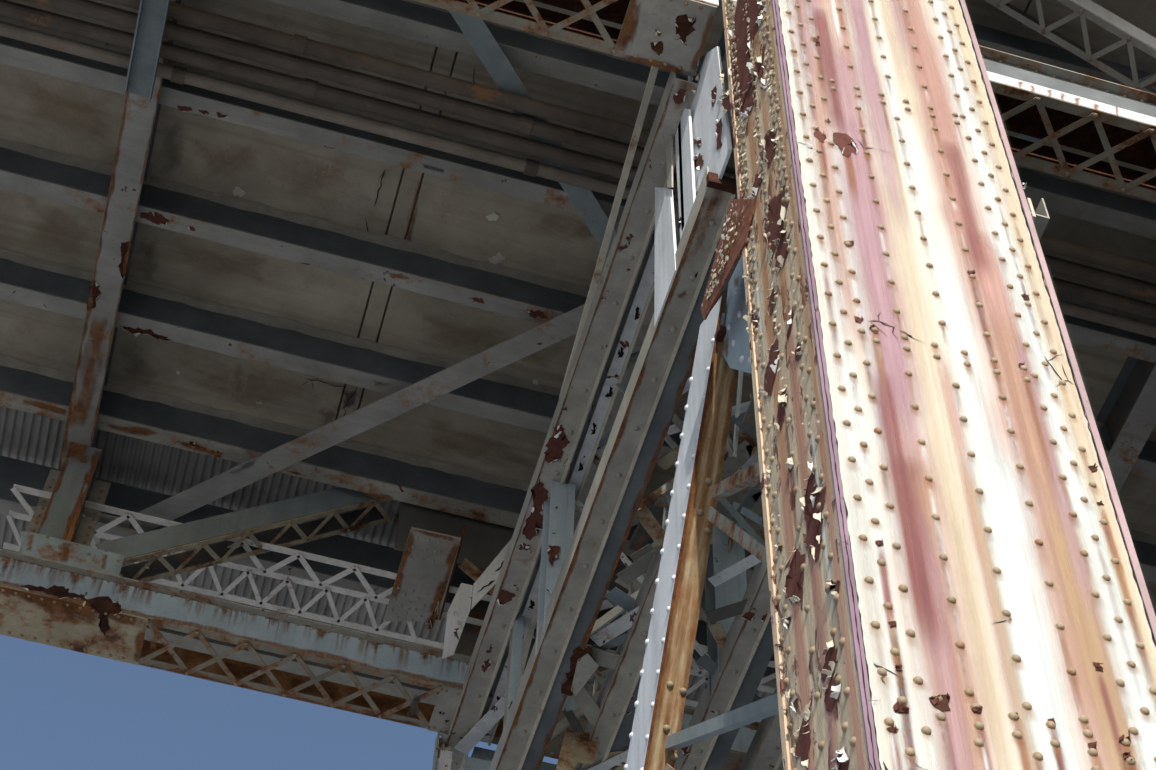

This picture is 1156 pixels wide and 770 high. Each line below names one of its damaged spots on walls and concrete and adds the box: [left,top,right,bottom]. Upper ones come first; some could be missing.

corrosion [2,78,163,583]
corrosion [0,457,545,748]
crack [365,170,385,232]
peeling [519,478,561,565]
corrosion [496,190,721,770]
peeling [675,14,696,43]
peeling [701,0,826,629]
peeling [785,640,841,770]
peeling [814,118,858,158]
peeling [831,747,849,770]
corrosion [801,0,991,770]
corrosion [898,0,1134,770]